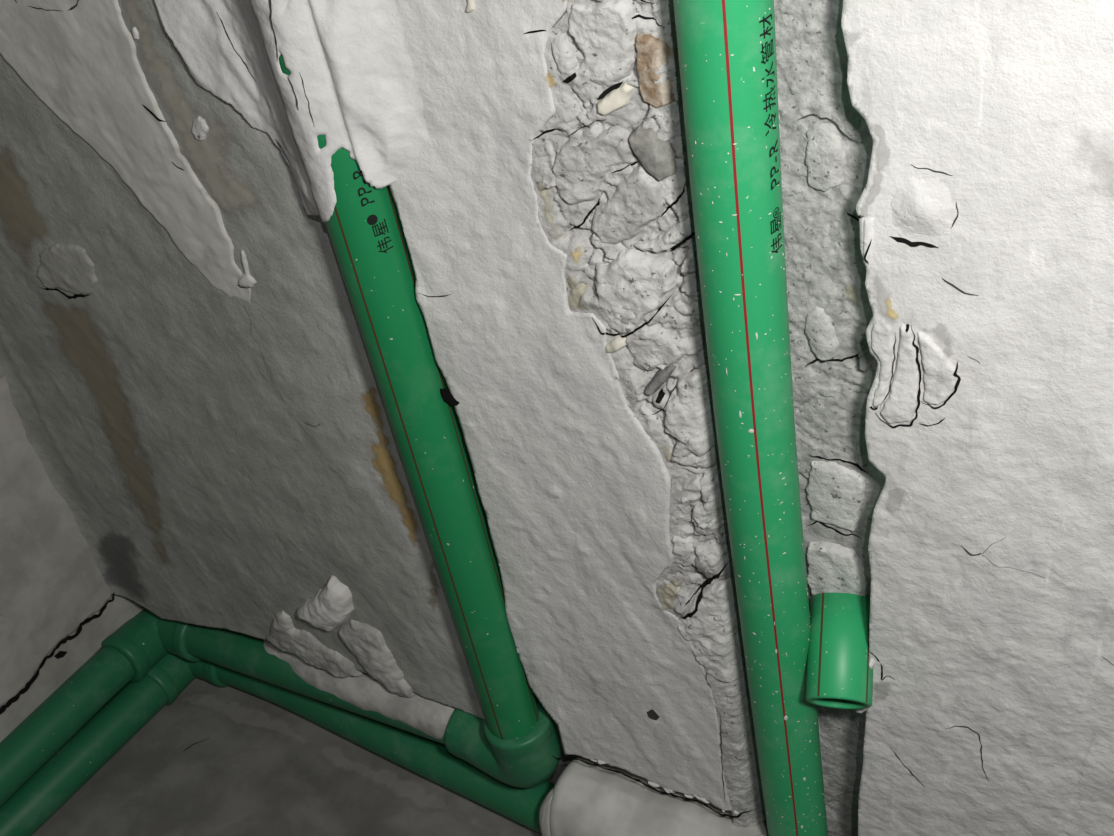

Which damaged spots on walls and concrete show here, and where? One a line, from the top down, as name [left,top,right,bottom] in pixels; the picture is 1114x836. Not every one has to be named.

water stain [0,152,46,264]
peeling [0,0,251,303]
crack [912,165,953,176]
spalling [774,0,961,613]
crack [942,278,979,296]
water stain [45,302,167,563]
spalling [530,0,767,828]
water stain [101,536,143,598]
crack [0,593,115,715]
crack [553,756,752,818]
spalling [817,705,866,836]